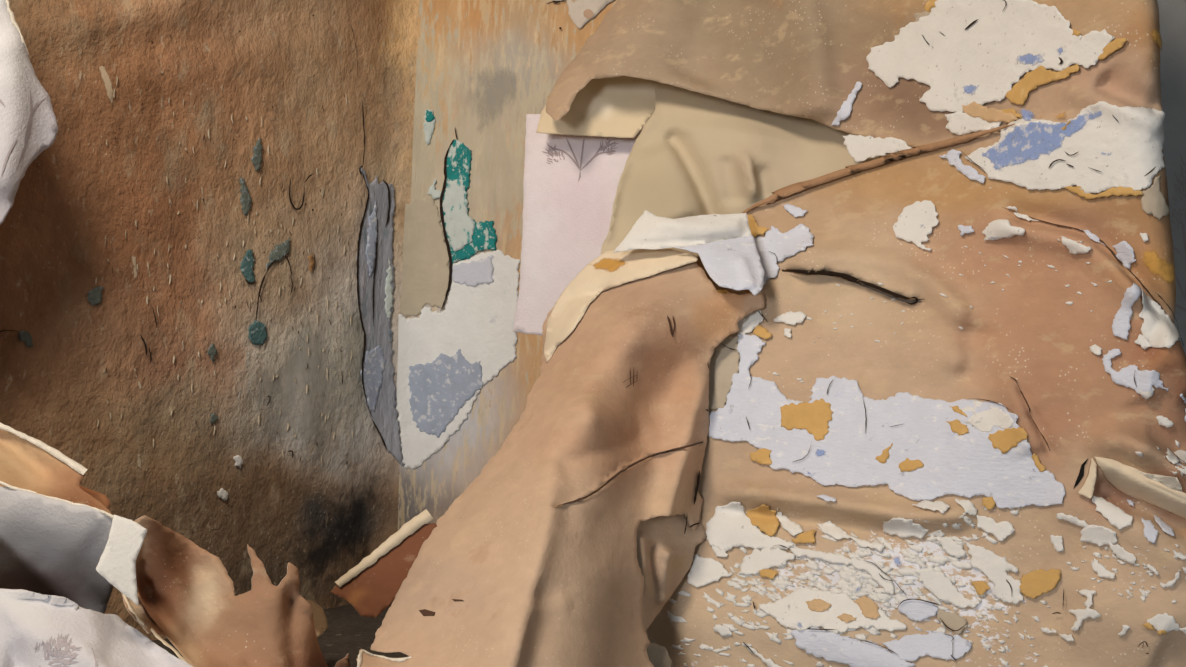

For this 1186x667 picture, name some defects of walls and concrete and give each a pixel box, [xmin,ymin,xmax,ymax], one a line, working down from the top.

peeling [423,109,436,145]
peeling [831,82,911,162]
peeling [866,0,1170,220]
spalling [217,87,330,296]
peeling [748,204,814,285]
peeling [893,200,939,251]
peeling [958,206,1038,266]
peeling [1057,229,1174,283]
spalling [219,282,271,348]
peeling [292,129,520,470]
peeling [1089,283,1186,428]
peeling [668,310,1186,667]